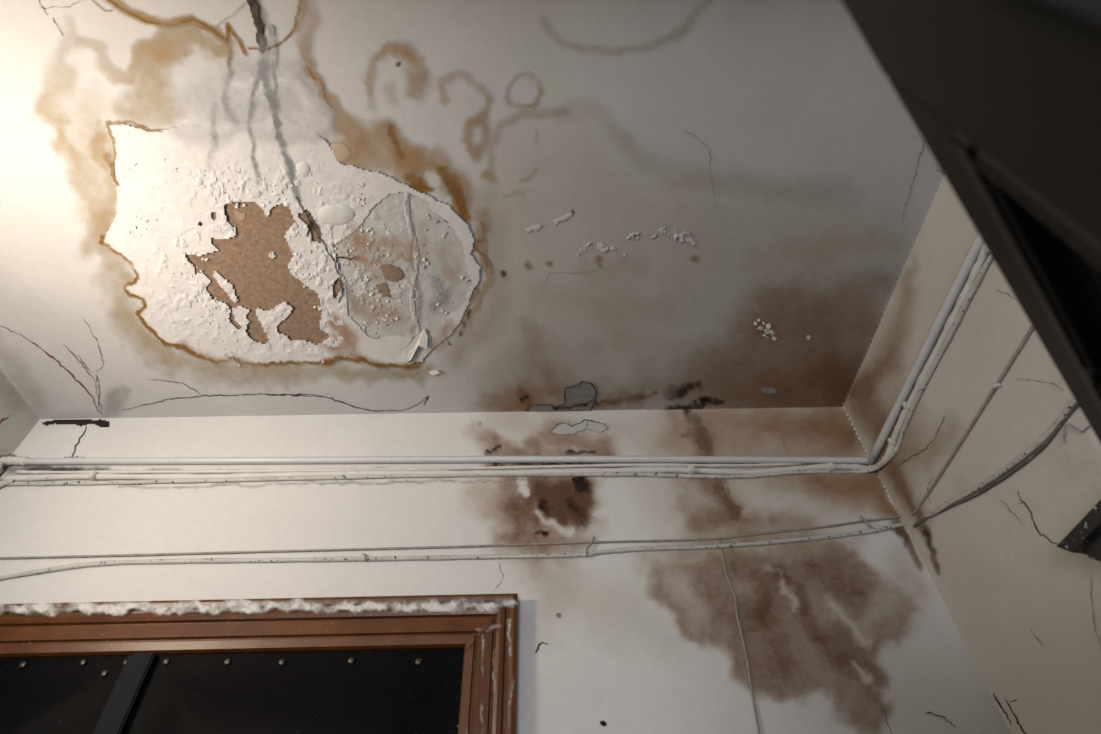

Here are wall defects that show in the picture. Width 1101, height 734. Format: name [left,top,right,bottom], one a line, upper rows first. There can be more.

damp [37,0,430,381]
peeling [104,67,481,375]
crack [295,196,355,303]
damp [303,58,493,345]
crack [1,319,429,458]
damp [487,375,564,412]
damp [582,390,644,410]
damp [484,424,623,554]
damp [653,286,915,730]
crack [1002,491,1058,545]
crack [993,693,1026,734]